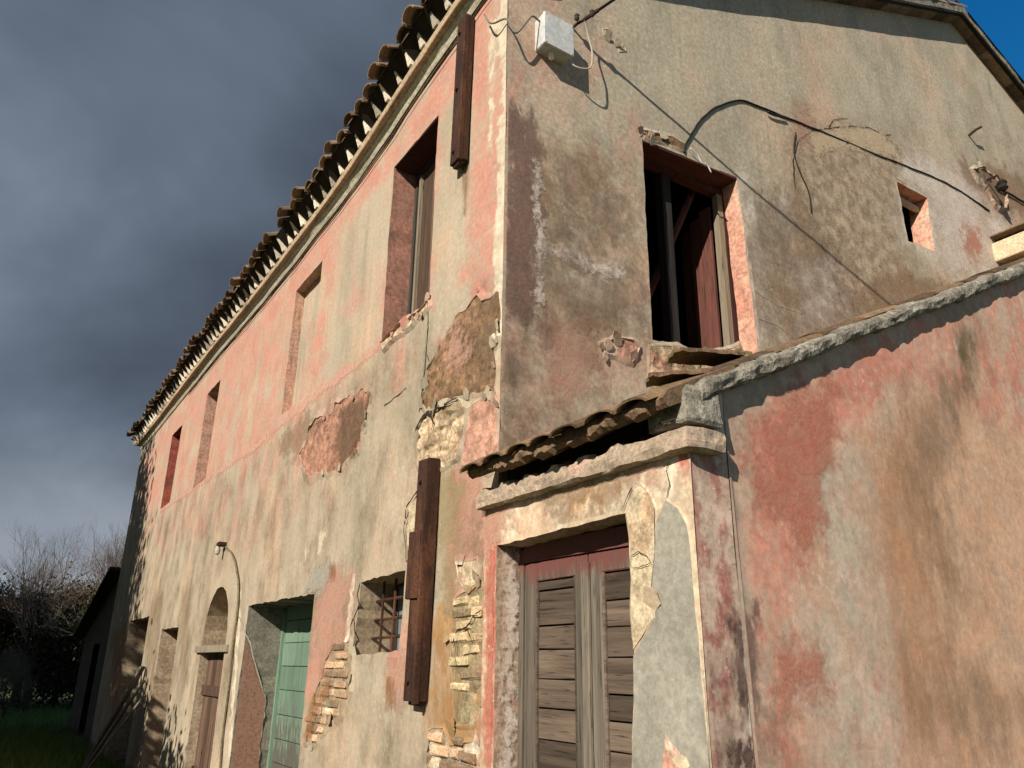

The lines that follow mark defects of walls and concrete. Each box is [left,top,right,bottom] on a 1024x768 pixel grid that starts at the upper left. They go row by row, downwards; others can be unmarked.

water stain [505,97,629,330]
spalling [638,126,687,154]
peeling [782,118,1009,333]
peeling [298,381,374,487]
spalling [380,292,433,354]
spalling [415,285,502,479]
peeling [597,331,712,388]
peeling [231,616,266,768]
flaking render [303,567,356,751]
flaking render [423,553,494,768]
peeling [625,462,712,768]
water stain [727,599,760,714]